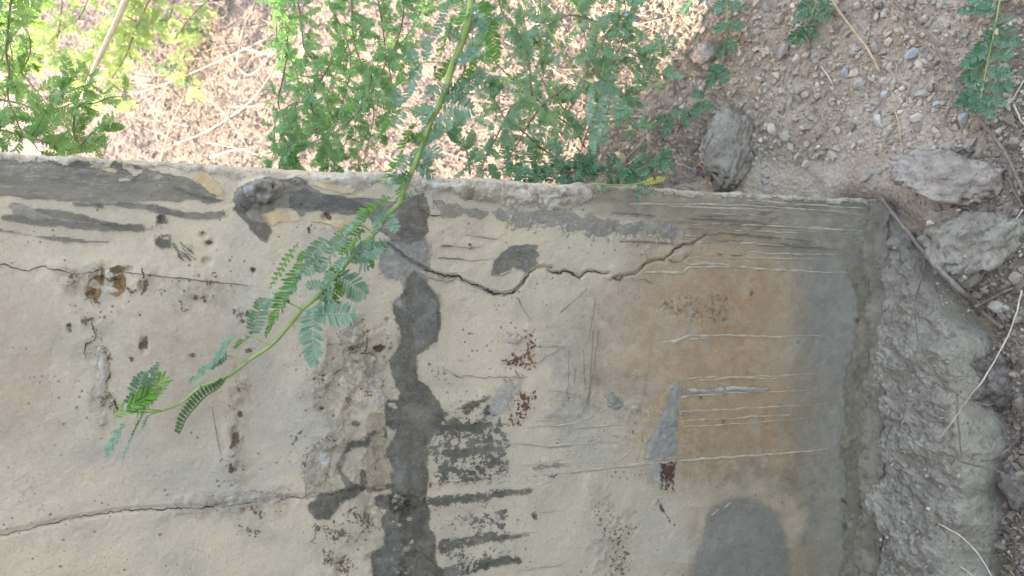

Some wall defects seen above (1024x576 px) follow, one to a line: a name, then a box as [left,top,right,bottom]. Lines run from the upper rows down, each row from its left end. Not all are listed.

crack [0,263,99,275]
crack [126,268,247,286]
crack [392,216,779,379]
leakage [0,160,870,576]
corrosion [503,329,536,380]
corrosion [505,388,538,428]
crack [5,478,340,535]
corrosion [651,461,676,521]